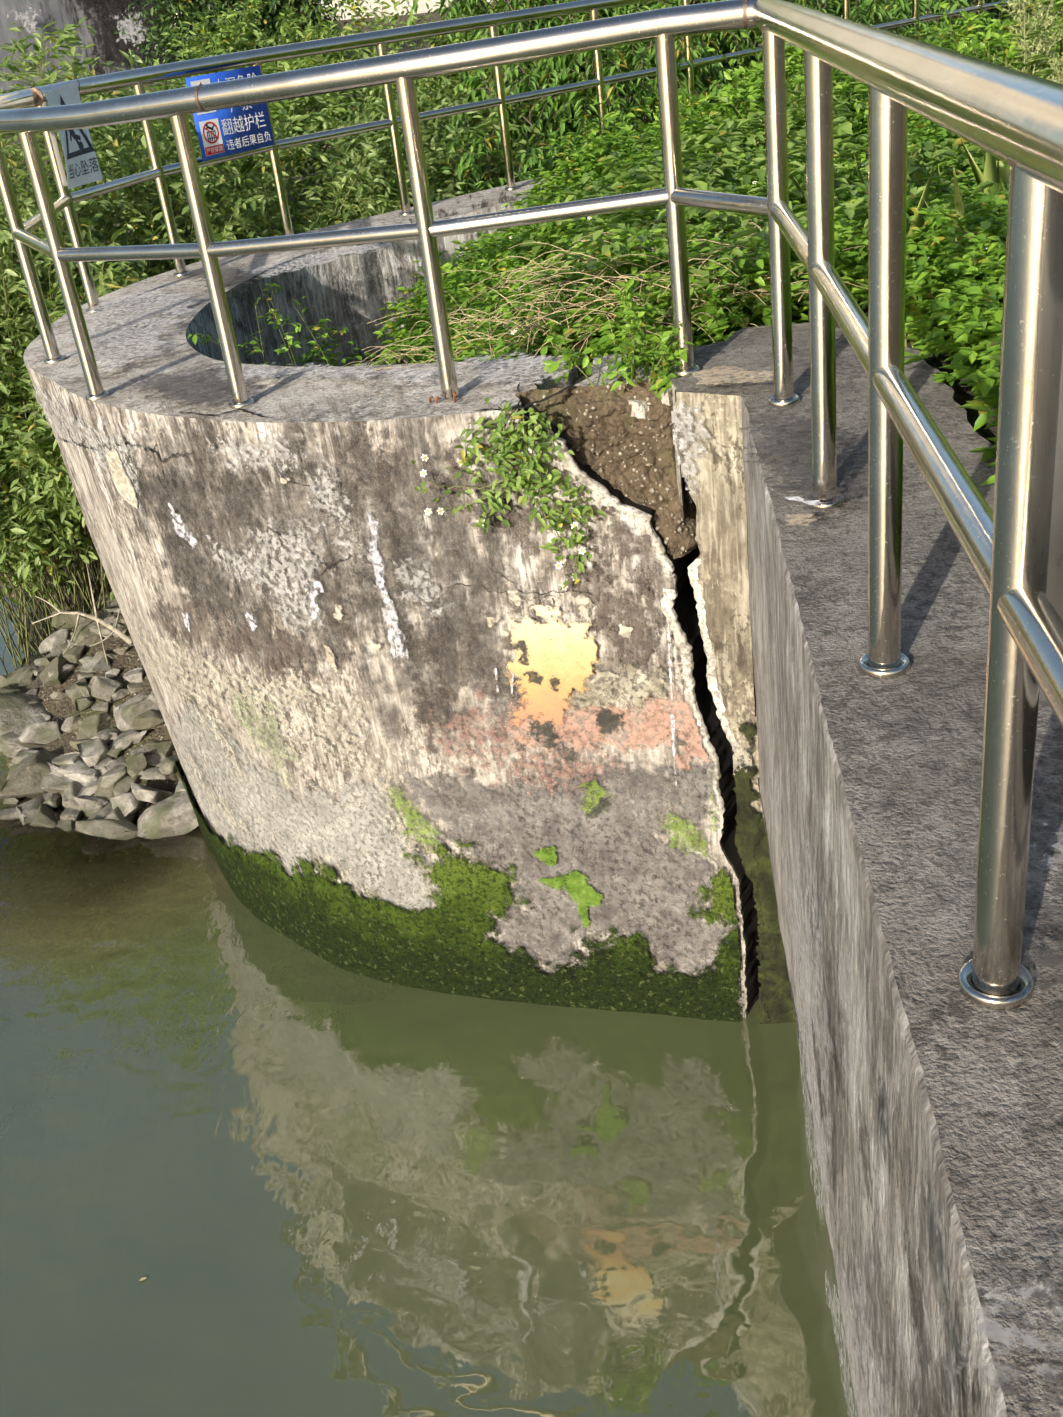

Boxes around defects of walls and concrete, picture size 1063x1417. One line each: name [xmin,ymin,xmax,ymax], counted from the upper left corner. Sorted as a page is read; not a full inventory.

leakage [104,384,736,980]
crack [446,566,611,620]
crack [473,370,761,1017]